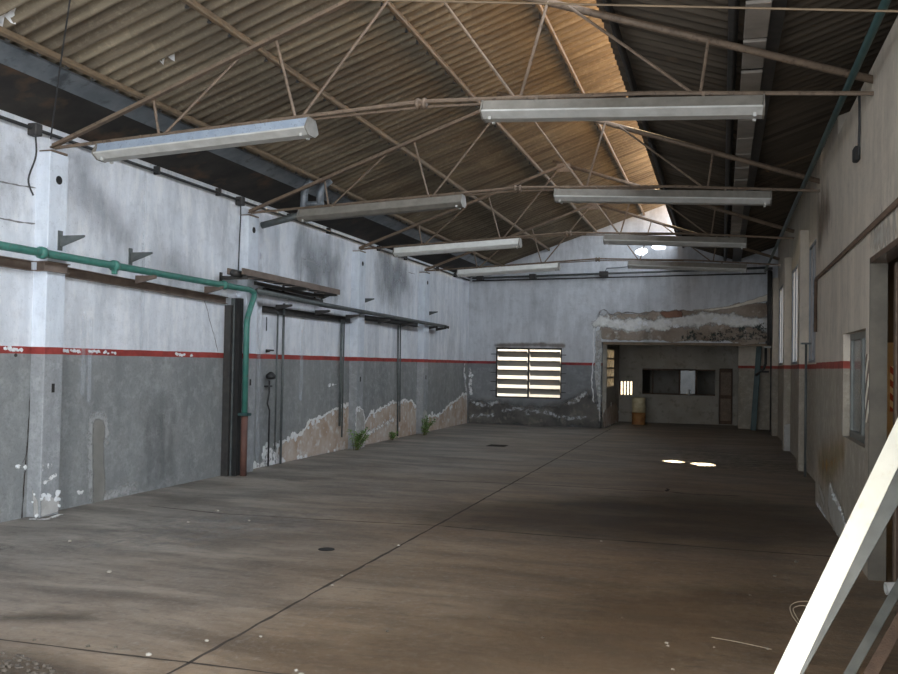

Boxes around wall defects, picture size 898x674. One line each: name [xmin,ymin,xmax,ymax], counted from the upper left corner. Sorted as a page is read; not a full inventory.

flaking render [592,295,767,428]
flaking render [428,364,474,431]
flaking render [253,399,416,469]
peeling [31,463,61,518]